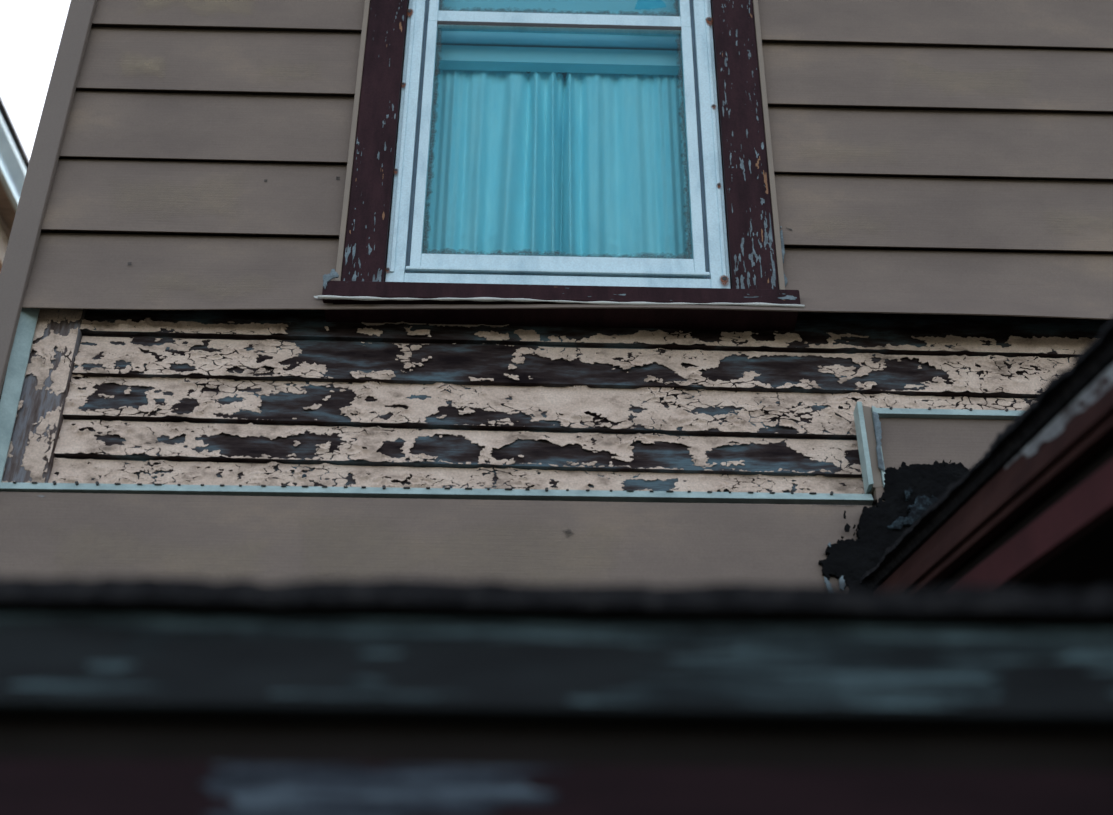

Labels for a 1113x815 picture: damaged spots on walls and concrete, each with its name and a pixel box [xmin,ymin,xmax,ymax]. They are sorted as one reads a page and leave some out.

peeling [343,201,385,282]
peeling [720,0,797,300]
peeling [2,303,1113,506]